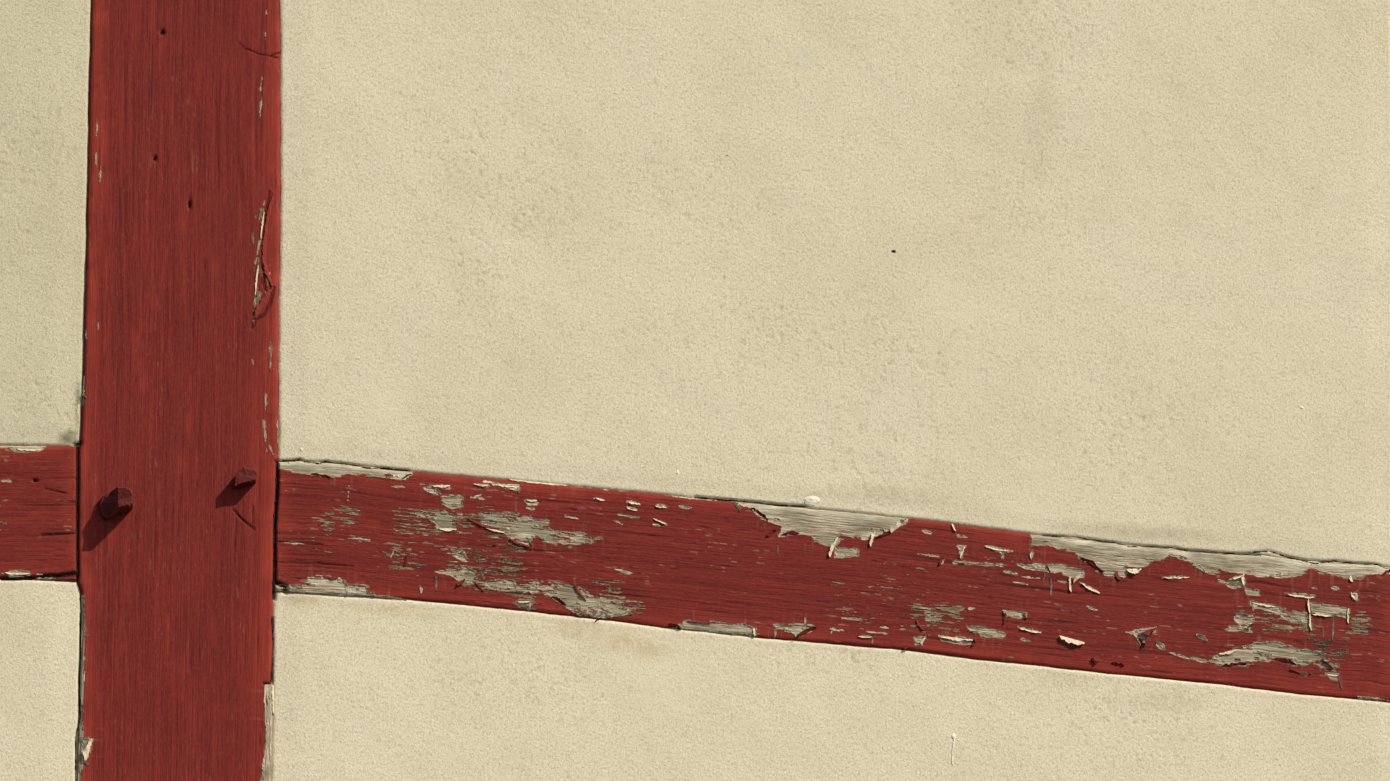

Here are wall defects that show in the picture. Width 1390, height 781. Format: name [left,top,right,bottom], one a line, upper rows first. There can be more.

peeling [0,445,44,453]
peeling [263,394,645,622]
peeling [615,496,932,558]
peeling [1,570,56,580]
peeling [668,620,757,636]